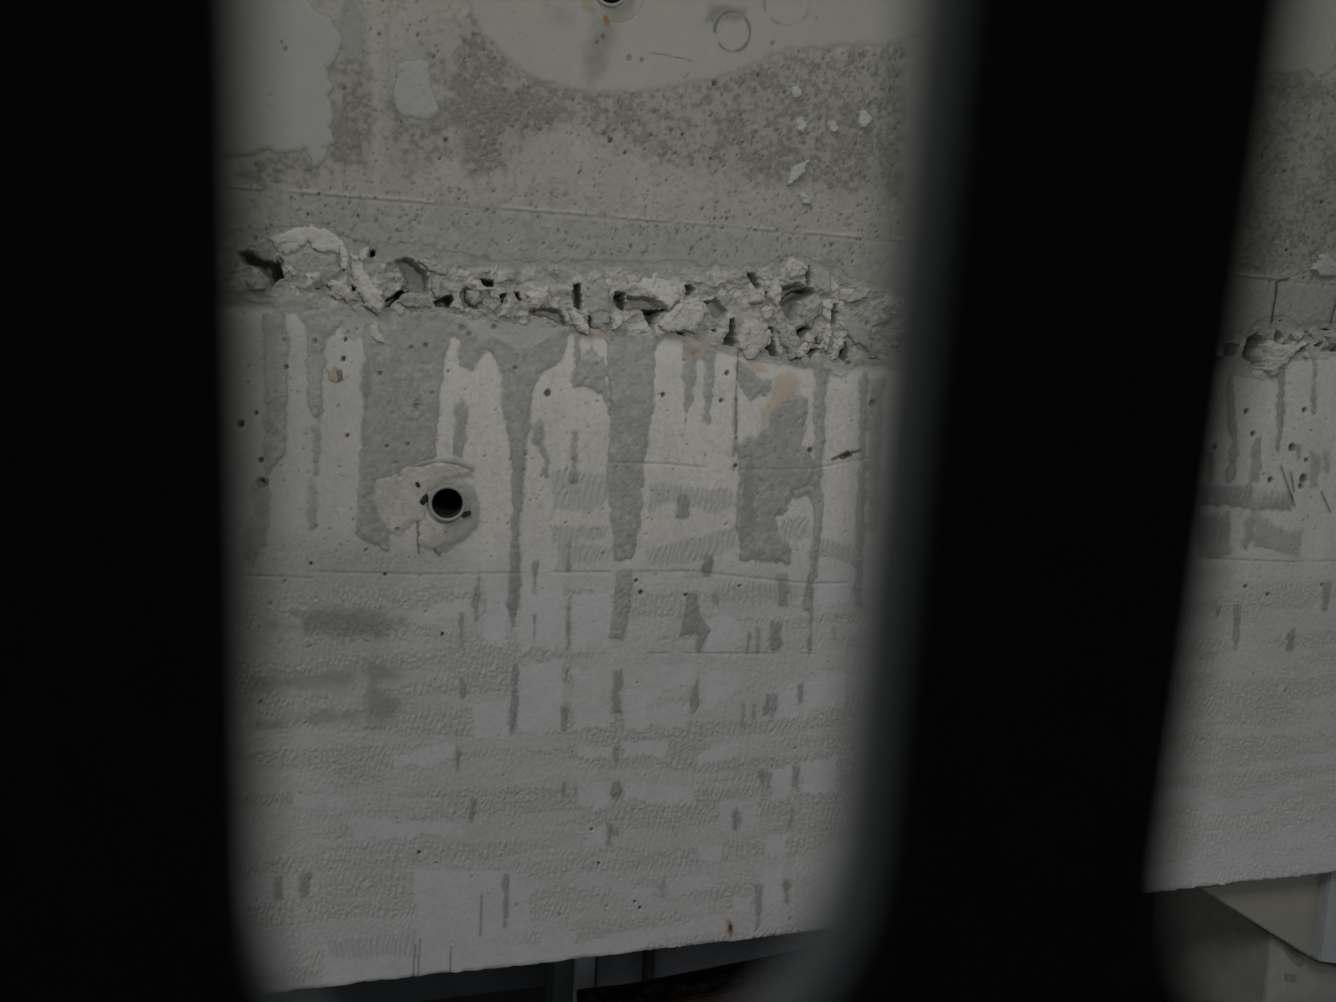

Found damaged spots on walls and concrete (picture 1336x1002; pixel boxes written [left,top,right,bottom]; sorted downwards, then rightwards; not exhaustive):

leakage [262,308,343,474]
leakage [683,342,714,423]
leakage [355,311,667,647]
leakage [733,361,828,653]
leakage [854,375,869,593]
leakage [511,664,519,728]
leakage [680,592,718,653]